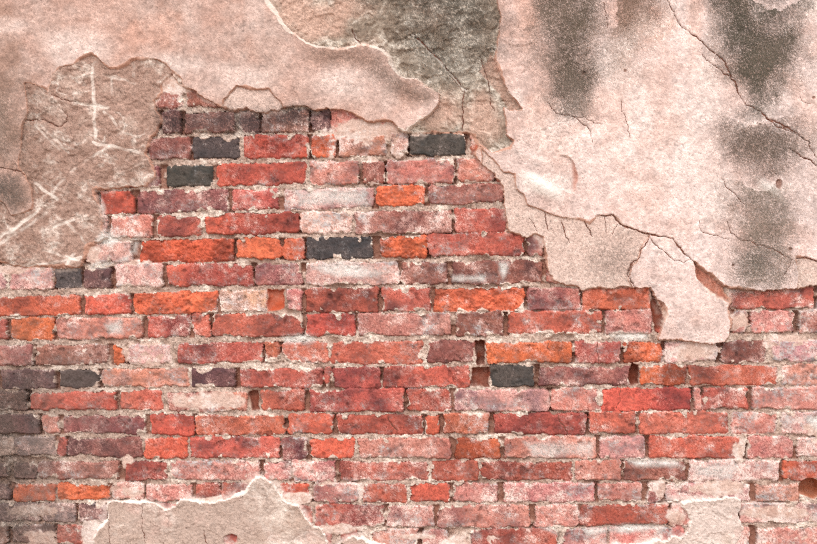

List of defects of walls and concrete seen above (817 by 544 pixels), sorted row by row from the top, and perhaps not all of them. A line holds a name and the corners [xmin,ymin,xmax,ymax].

water stain [539,0,595,110]
water stain [616,0,647,26]
crack [667,0,816,166]
water stain [710,0,809,114]
flaking render [0,0,702,366]
water stain [729,127,796,159]
crack [584,214,696,286]
flaking render [694,247,817,343]
crack [699,221,817,276]
water stain [745,188,784,283]
spalling [57,475,300,544]
flaking render [635,496,744,544]